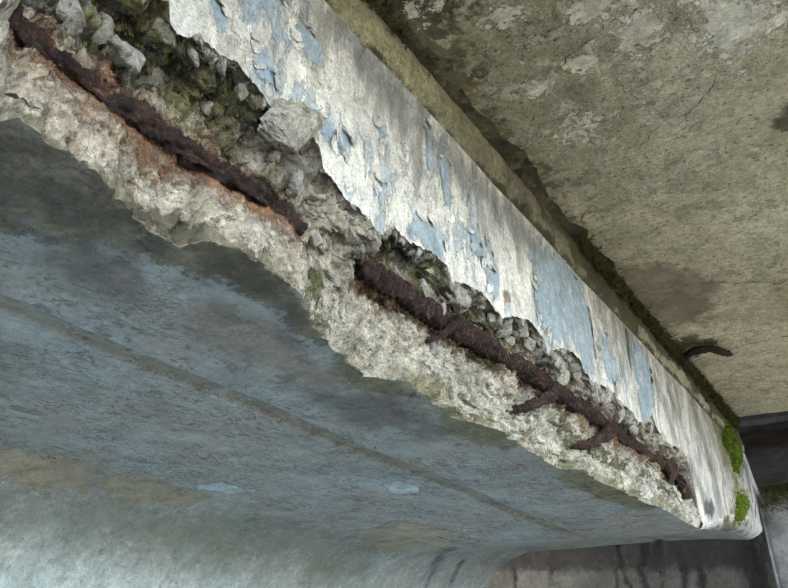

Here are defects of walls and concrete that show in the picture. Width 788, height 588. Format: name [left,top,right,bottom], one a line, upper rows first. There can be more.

flaking render [402,0,447,31]
flaking render [560,40,600,75]
flaking render [562,0,677,64]
flaking render [677,0,788,79]
corrosion [6,29,306,254]
peeling [313,107,357,163]
crack [640,63,722,146]
water stain [774,107,788,131]
corrosion [349,267,432,333]
peeling [528,232,596,376]
corrosion [427,337,543,397]
water stain [498,461,769,588]